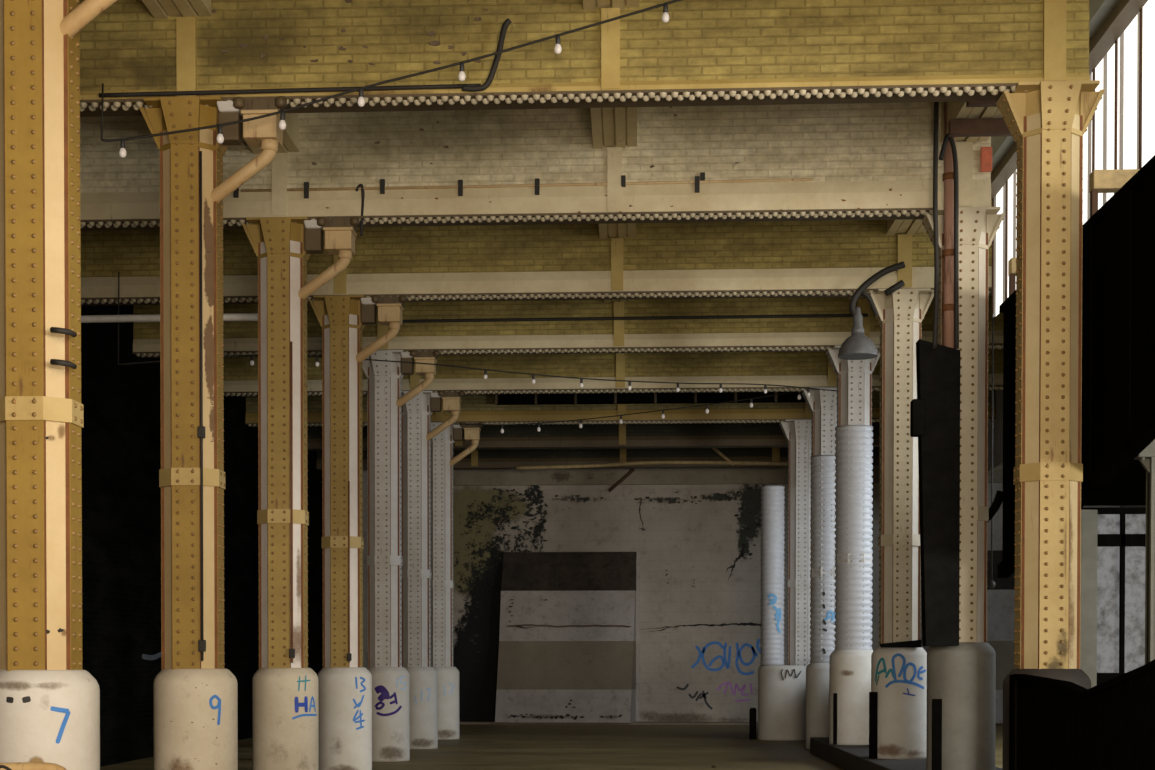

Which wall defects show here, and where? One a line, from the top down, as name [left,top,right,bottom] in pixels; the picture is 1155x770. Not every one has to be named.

leakage [453,485,548,611]